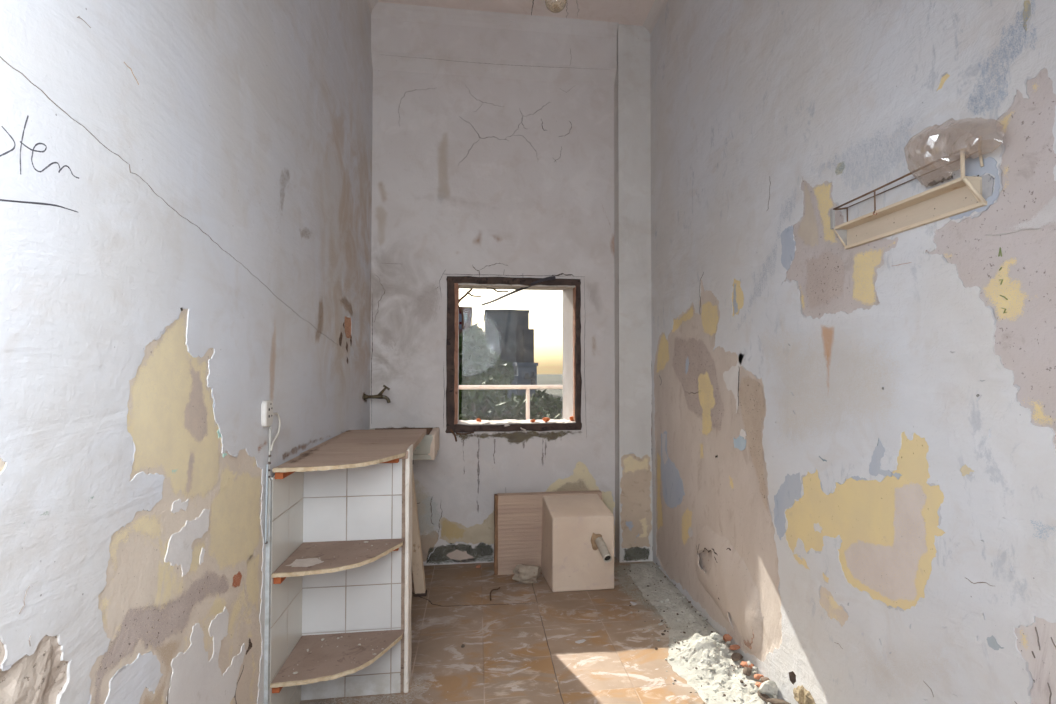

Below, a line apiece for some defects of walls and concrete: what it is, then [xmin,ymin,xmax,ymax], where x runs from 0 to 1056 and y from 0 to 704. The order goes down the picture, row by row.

crack [389,49,589,166]
peeling [780,161,898,319]
flaking render [925,0,1056,449]
flaking render [339,316,353,363]
peeling [87,307,263,704]
peeling [418,510,494,562]
peeling [546,278,945,662]
flaking render [0,635,69,704]
peeling [1014,617,1056,704]